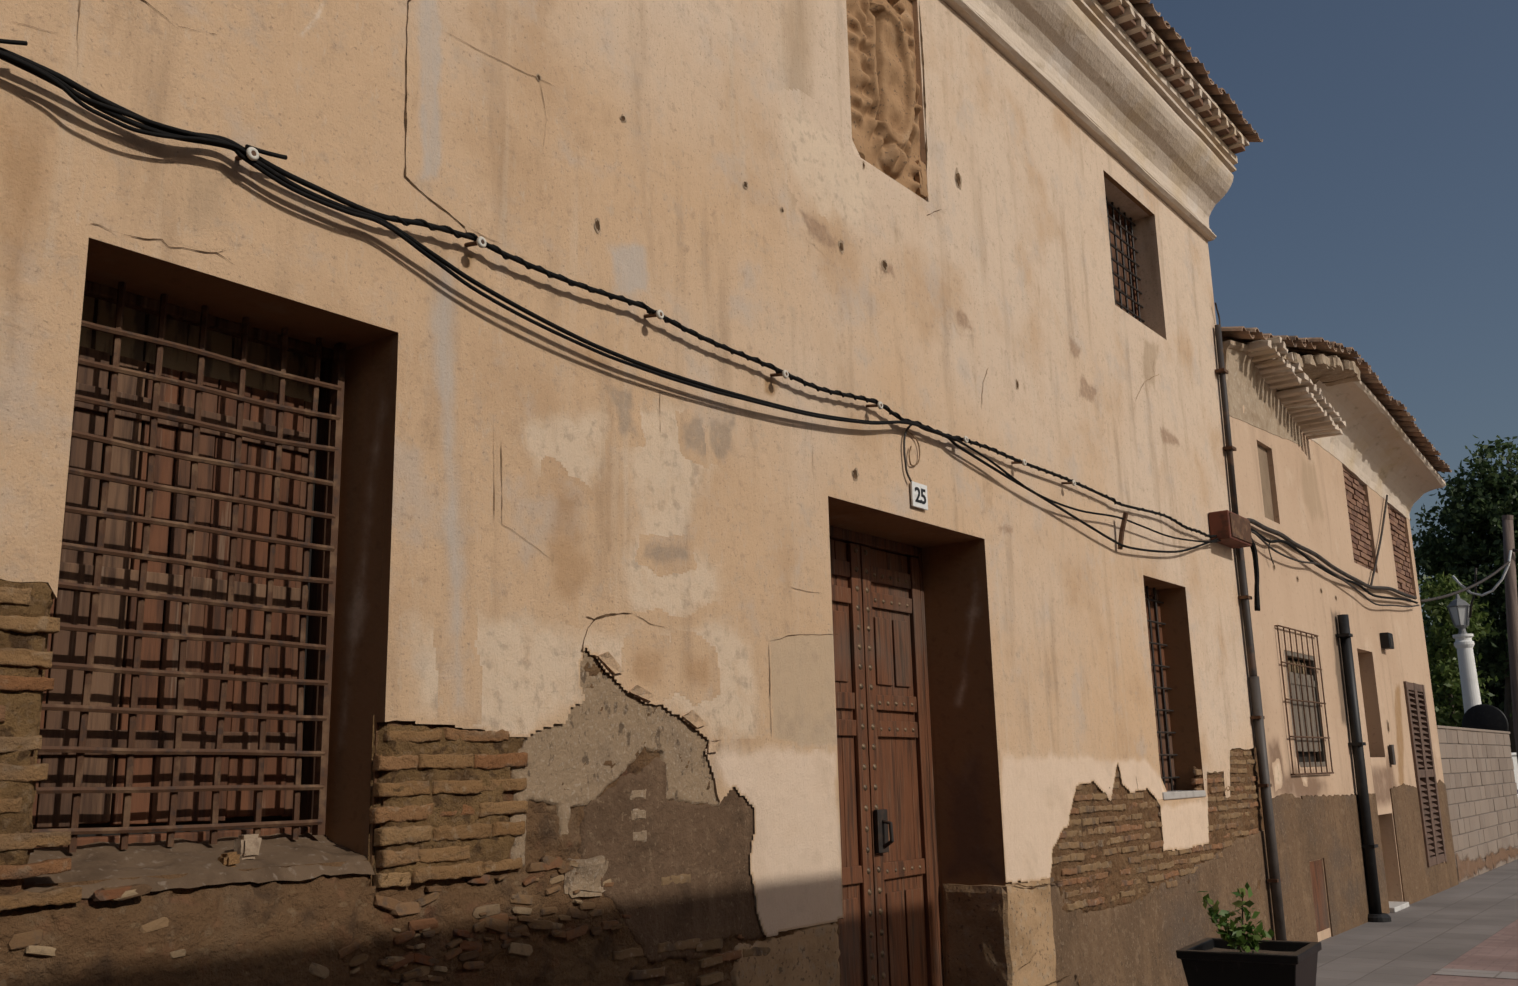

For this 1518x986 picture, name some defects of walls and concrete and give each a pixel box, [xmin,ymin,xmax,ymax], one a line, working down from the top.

crack [12,0,81,66]
crack [404,0,552,244]
flaking render [0,579,169,986]
flaking render [309,650,840,986]
flaking render [1052,748,1283,913]